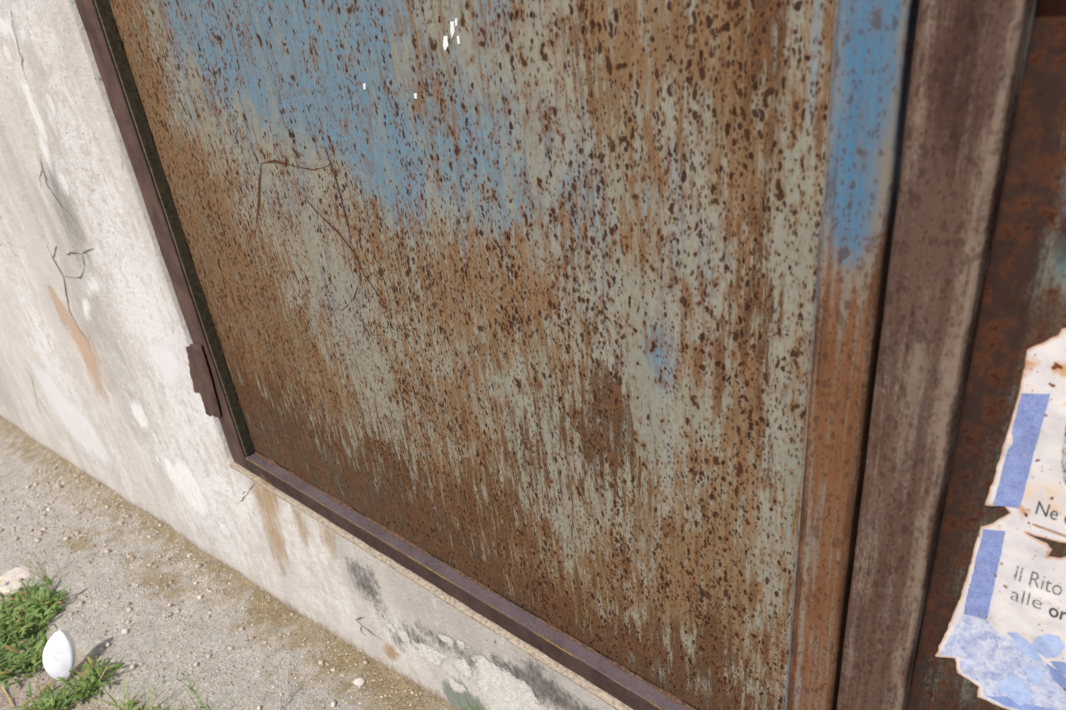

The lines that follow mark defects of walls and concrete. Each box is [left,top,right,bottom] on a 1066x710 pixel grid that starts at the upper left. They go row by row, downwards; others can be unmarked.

crack [39,158,92,350]